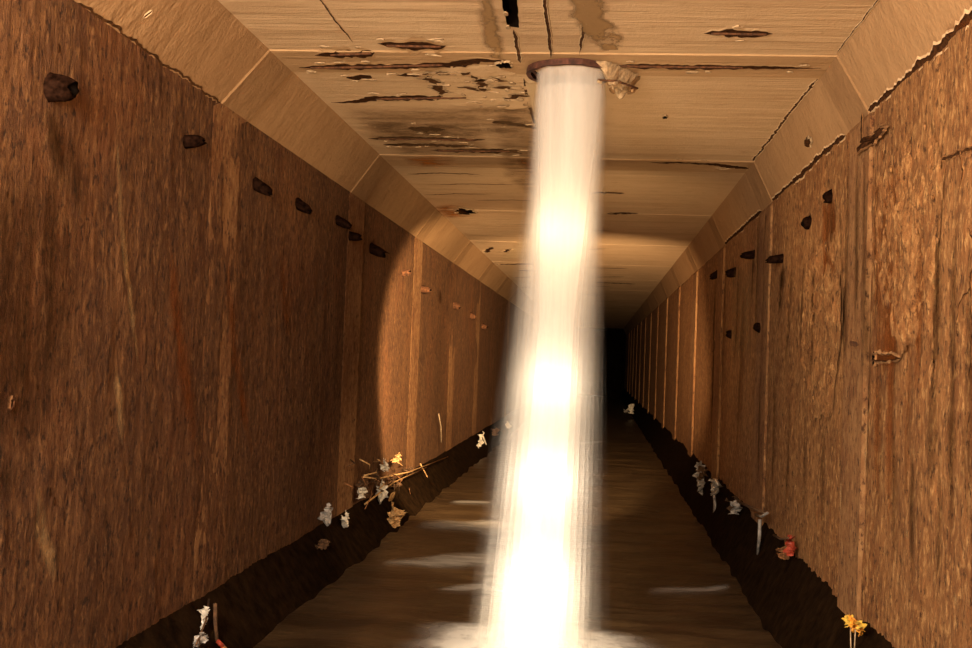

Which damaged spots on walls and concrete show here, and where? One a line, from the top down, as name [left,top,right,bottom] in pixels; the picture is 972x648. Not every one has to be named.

crack [320,0,352,41]
crack [542,0,553,58]
crack [579,3,588,55]
water stain [571,0,622,50]
crack [512,30,536,126]
crack [725,0,972,321]
peeling [856,122,945,368]